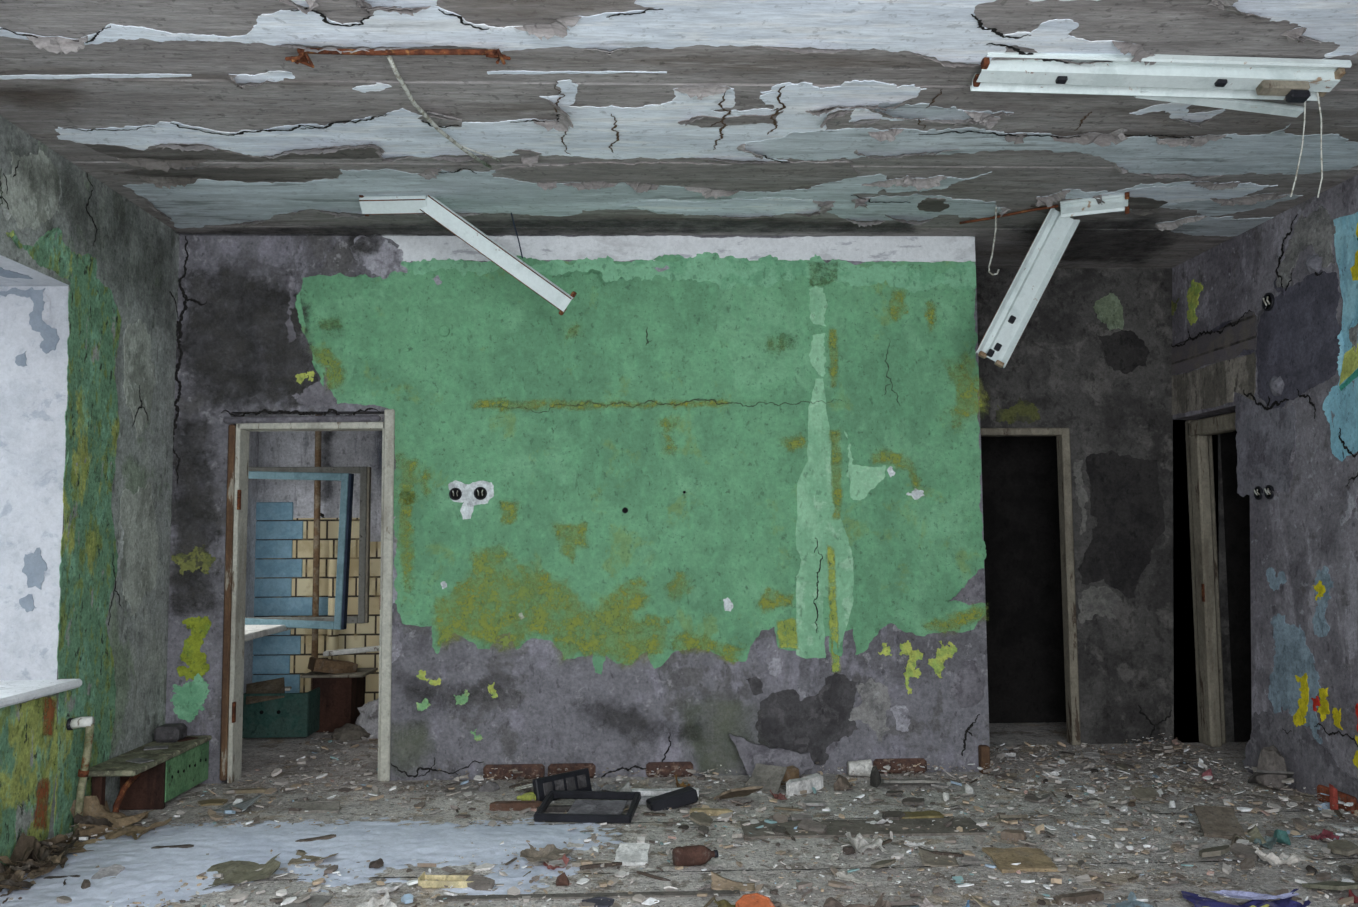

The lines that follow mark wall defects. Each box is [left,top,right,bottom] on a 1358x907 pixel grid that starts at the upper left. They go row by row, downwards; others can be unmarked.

peeling [0,0,1156,68]
peeling [1207,0,1358,59]
crack [609,114,619,153]
peeling [55,70,1358,237]
crack [710,93,731,150]
crack [767,86,786,135]
leakage [175,224,456,256]
leakage [469,220,913,236]
crack [132,236,207,484]
leakage [176,268,318,413]
spalling [1172,206,1358,498]
leakage [170,420,221,615]